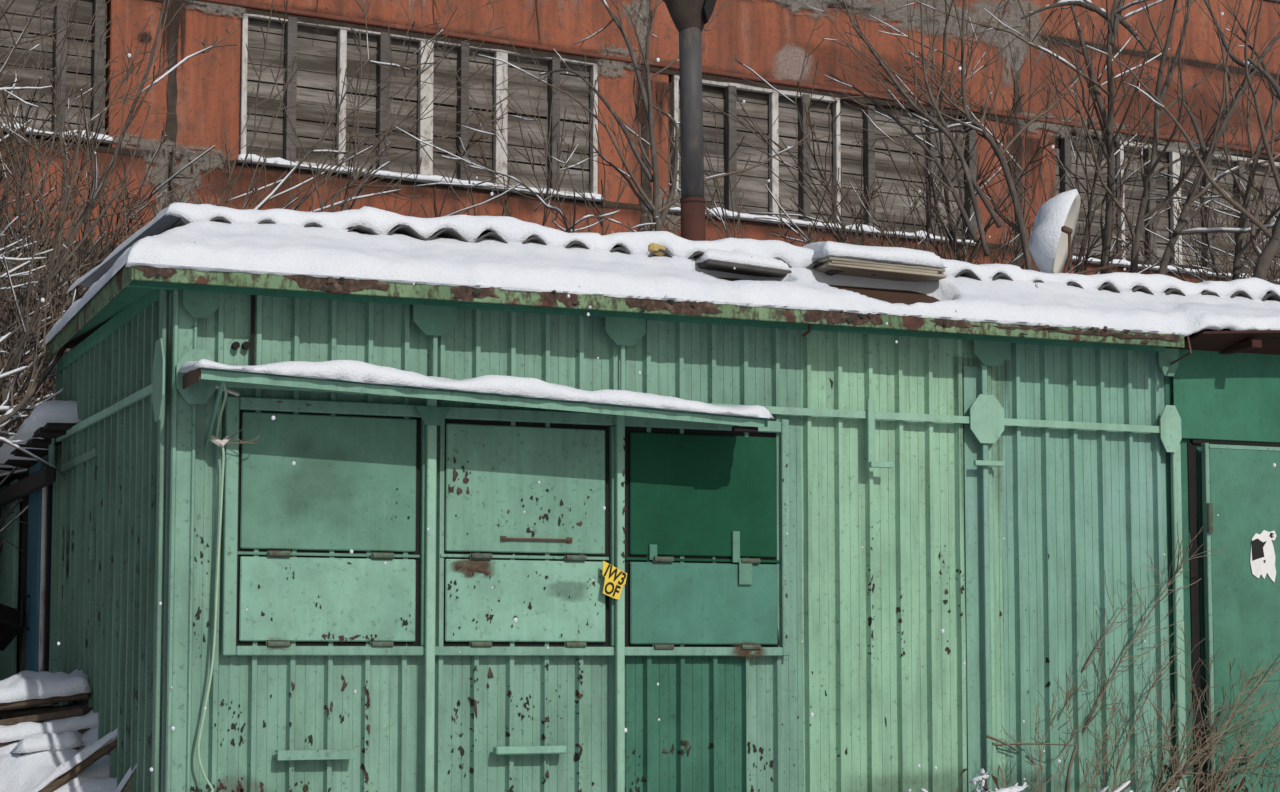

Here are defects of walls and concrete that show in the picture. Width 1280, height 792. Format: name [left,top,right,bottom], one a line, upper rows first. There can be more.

spalling [777,0,1041,83]
corrosion [451,286,500,302]
corrosion [538,290,580,308]
corrosion [626,298,722,316]
corrosion [803,310,883,325]
corrosion [454,560,490,577]